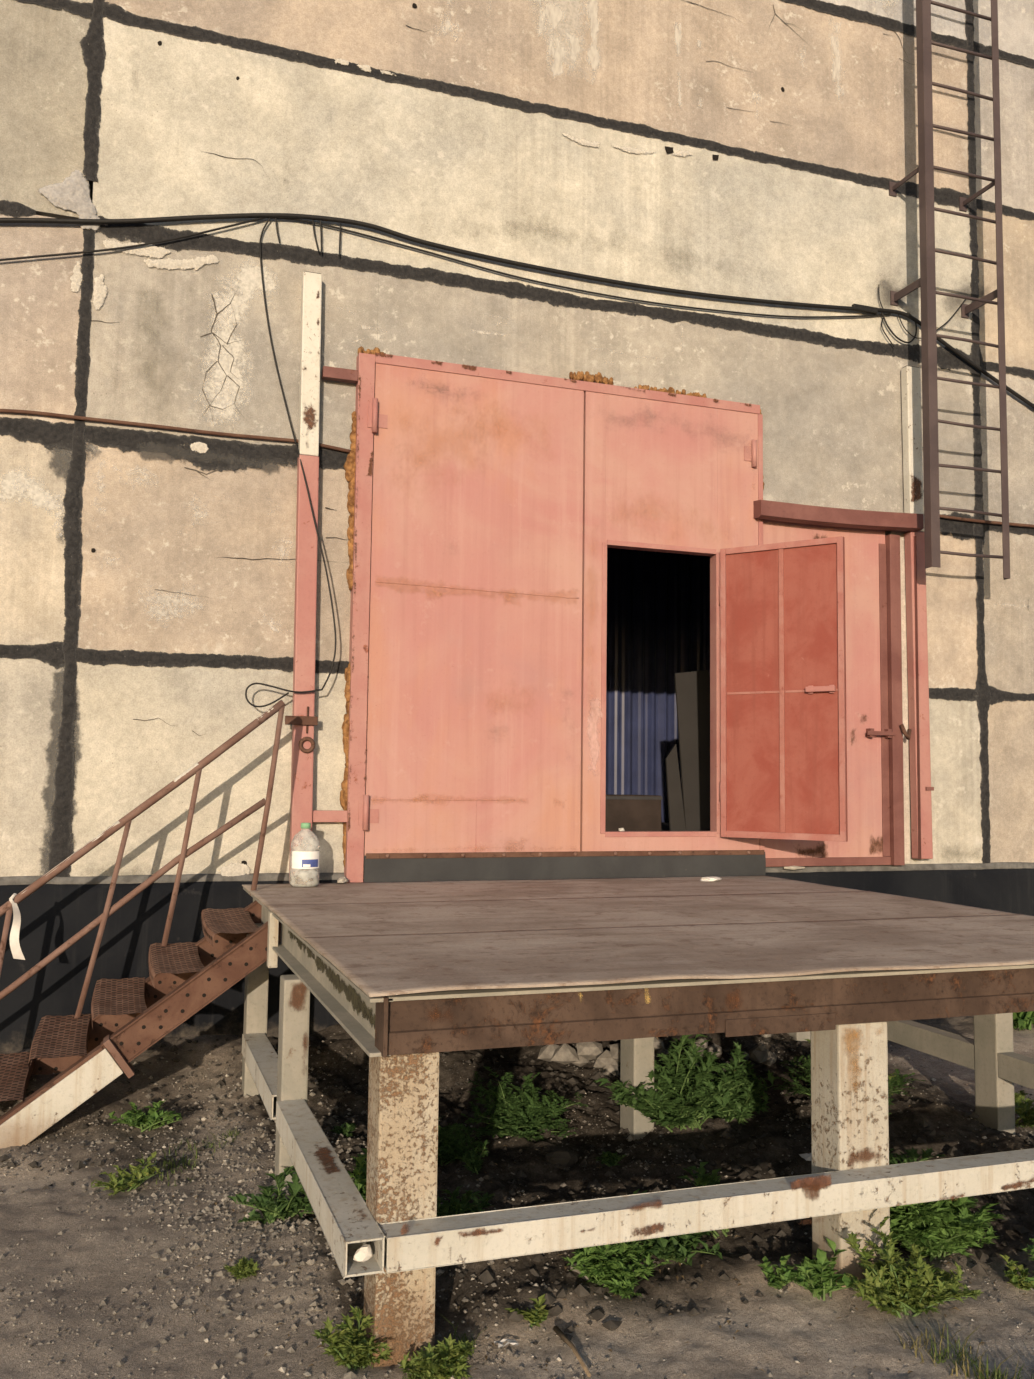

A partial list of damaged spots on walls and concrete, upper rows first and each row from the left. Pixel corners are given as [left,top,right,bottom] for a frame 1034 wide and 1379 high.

spalling [103,239,219,270]
spalling [70,260,107,310]
crack [200,286,244,420]
rust [304,407,318,444]
rust [314,1147,340,1174]
rust [849,1150,874,1165]
rust [790,1175,832,1199]